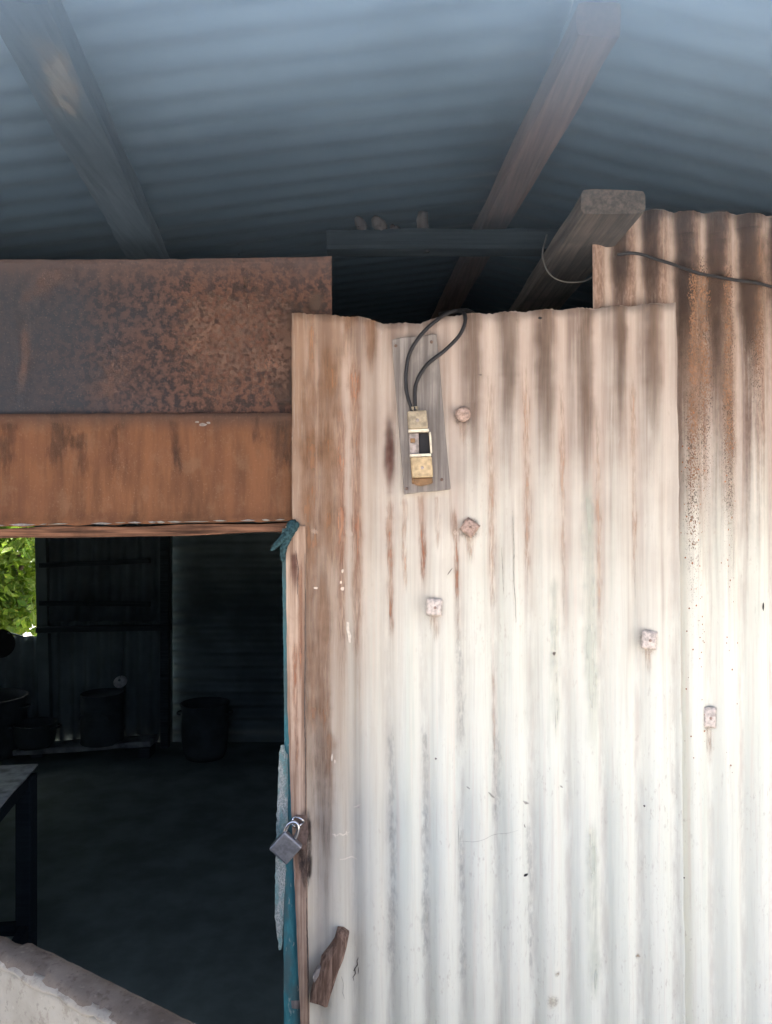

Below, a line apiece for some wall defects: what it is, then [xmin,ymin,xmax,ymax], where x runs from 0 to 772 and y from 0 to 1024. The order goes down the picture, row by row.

corrosion [182,292,292,386]
corrosion [292,408,361,580]
corrosion [350,368,360,405]
corrosion [385,429,394,481]
corrosion [455,521,467,595]
corrosion [681,259,735,564]
corrosion [751,241,769,387]
corrosion [293,644,332,775]